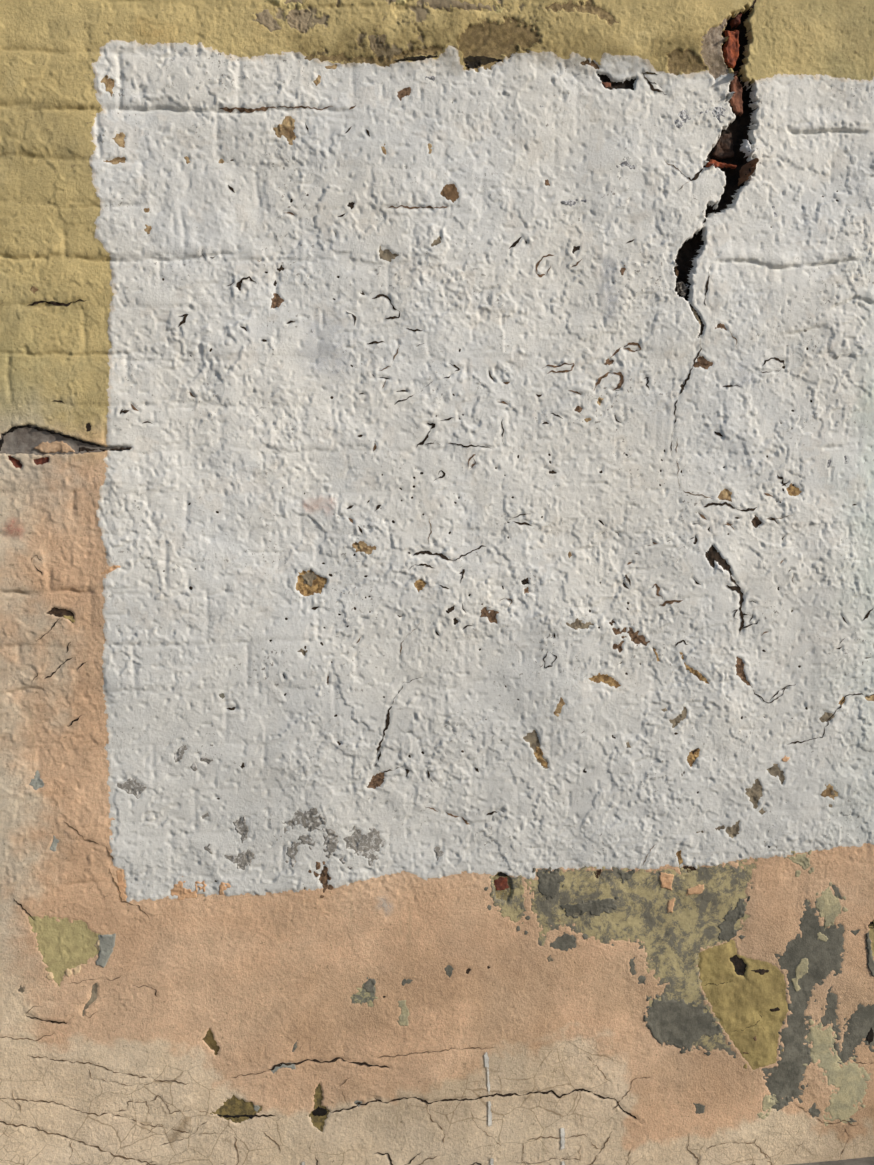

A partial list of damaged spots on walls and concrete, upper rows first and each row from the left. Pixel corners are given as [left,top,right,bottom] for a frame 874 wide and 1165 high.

flaking render [304,0,541,86]
crack [665,161,705,190]
crack [547,342,650,419]
flaking render [0,423,132,469]
crack [671,337,789,520]
crack [727,574,758,635]
peeling [523,730,549,769]
peeling [745,755,790,815]
peeling [28,915,116,987]
peeling [484,850,874,1126]
crack [0,1006,281,1165]
crack [234,1042,650,1165]